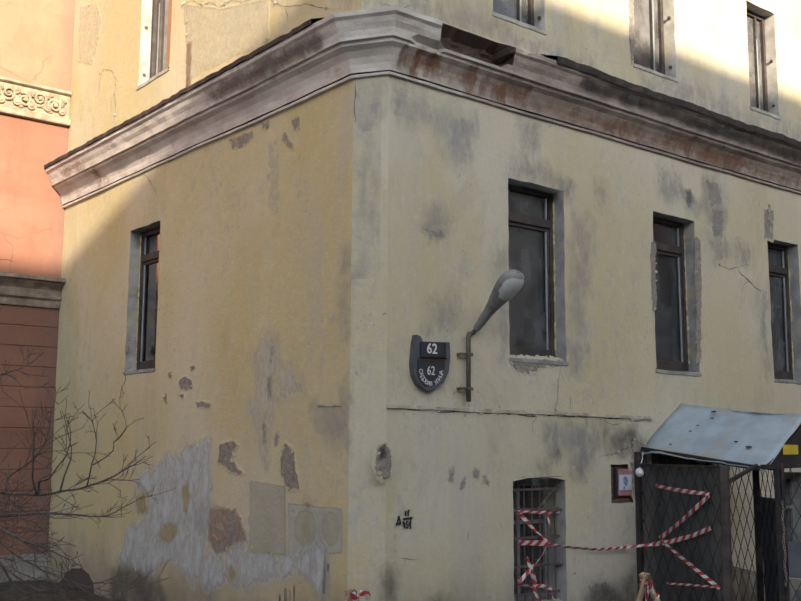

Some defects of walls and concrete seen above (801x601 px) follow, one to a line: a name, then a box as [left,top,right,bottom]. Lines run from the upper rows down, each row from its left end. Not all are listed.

crack [182,0,247,22]
crack [271,0,340,22]
crack [719,263,769,363]
peeling [167,363,196,402]
flaking render [216,438,245,477]
flaking render [279,439,302,494]
flaking render [371,442,394,483]
peeling [206,504,248,554]